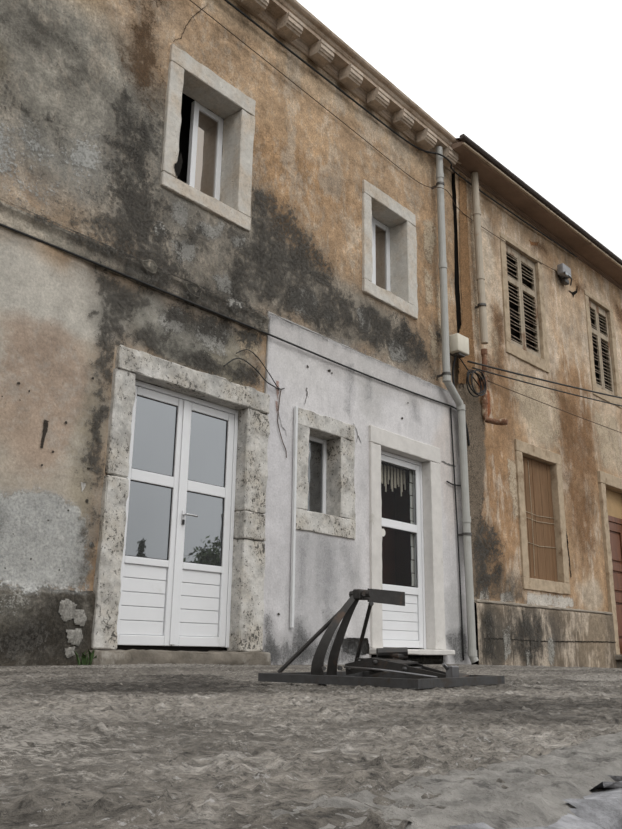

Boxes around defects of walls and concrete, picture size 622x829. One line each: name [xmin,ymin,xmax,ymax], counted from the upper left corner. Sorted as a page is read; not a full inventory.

damp [0,0,438,665]
flaking render [57,597,87,658]
damp [448,627,467,663]
damp [471,493,555,666]